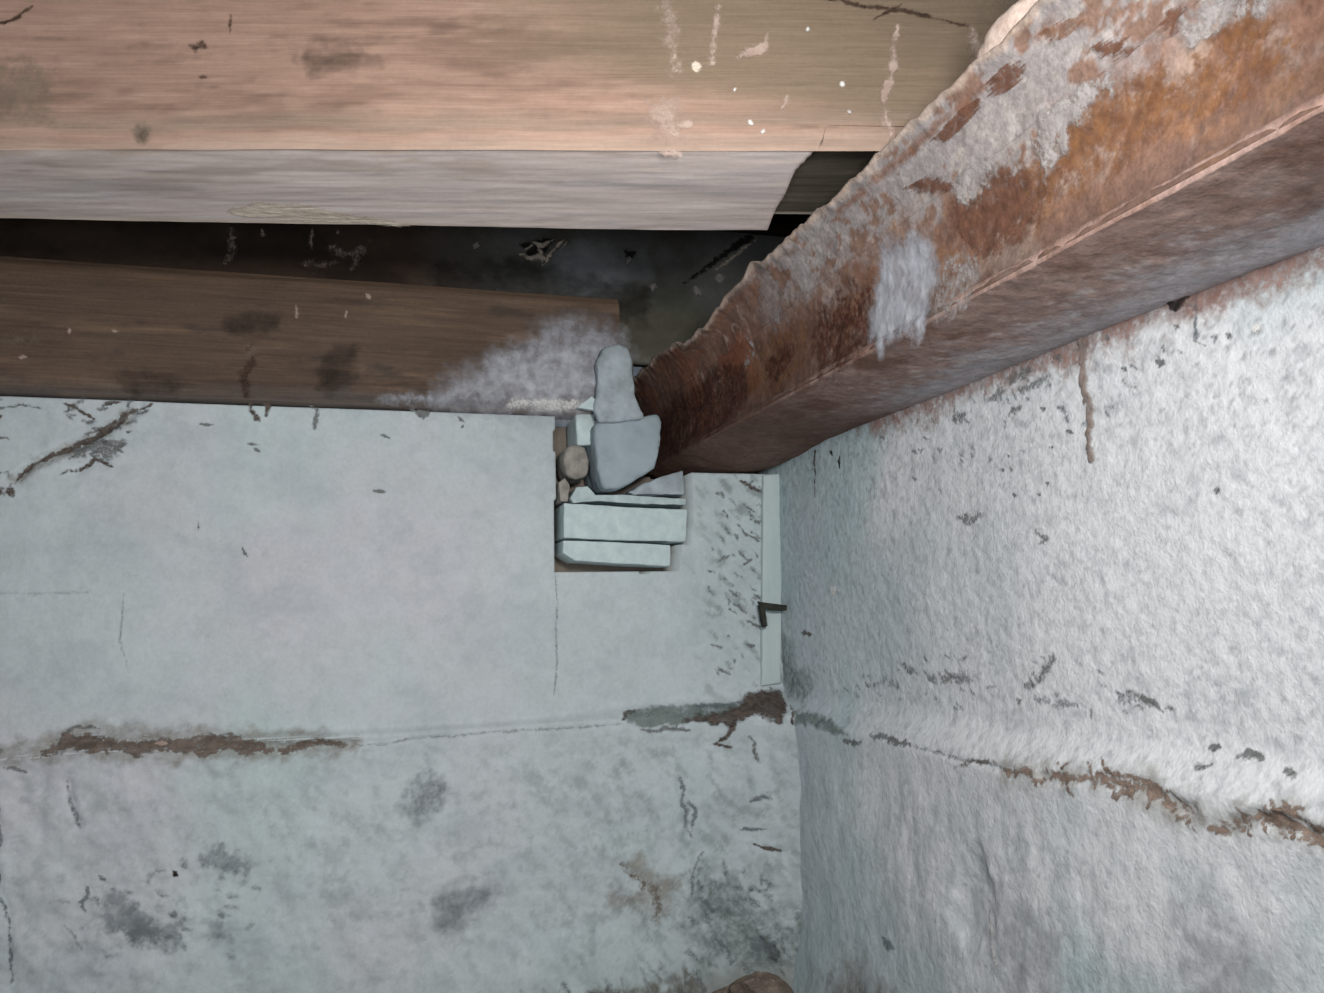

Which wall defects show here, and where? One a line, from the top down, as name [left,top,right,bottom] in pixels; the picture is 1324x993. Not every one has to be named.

corrosion [903,0,1296,257]
corrosion [660,280,874,455]
corrosion [857,247,1324,435]
crack [0,398,153,497]
crack [0,725,358,773]
crack [843,733,1324,845]
crack [0,831,14,983]
damp [87,892,185,948]